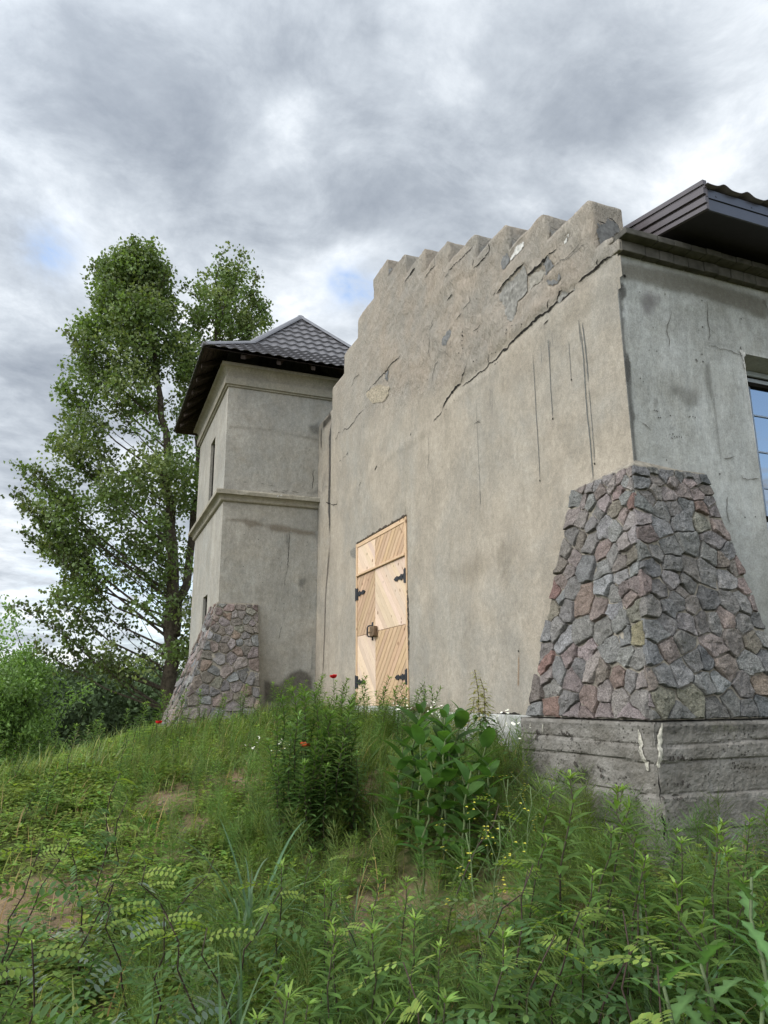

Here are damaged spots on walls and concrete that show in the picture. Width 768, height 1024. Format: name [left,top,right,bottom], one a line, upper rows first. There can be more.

crack [405,243,611,460]
spalling [499,238,561,334]
damp [533,342,553,482]
damp [569,321,595,475]
spalling [596,218,620,244]